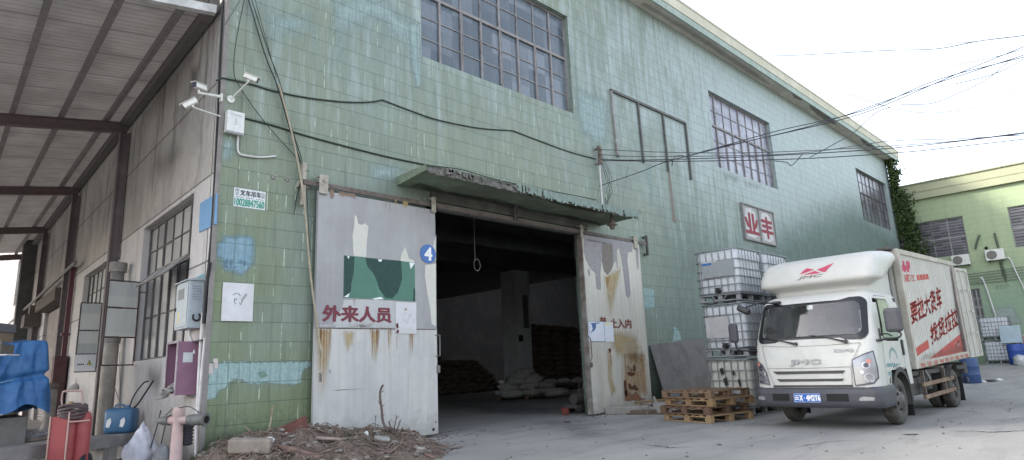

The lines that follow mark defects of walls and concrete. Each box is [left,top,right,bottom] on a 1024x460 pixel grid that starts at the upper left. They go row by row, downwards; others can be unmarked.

peeling [352,215,368,257]
rust [319,329,331,367]
rust [346,325,391,350]
rust [608,331,647,401]